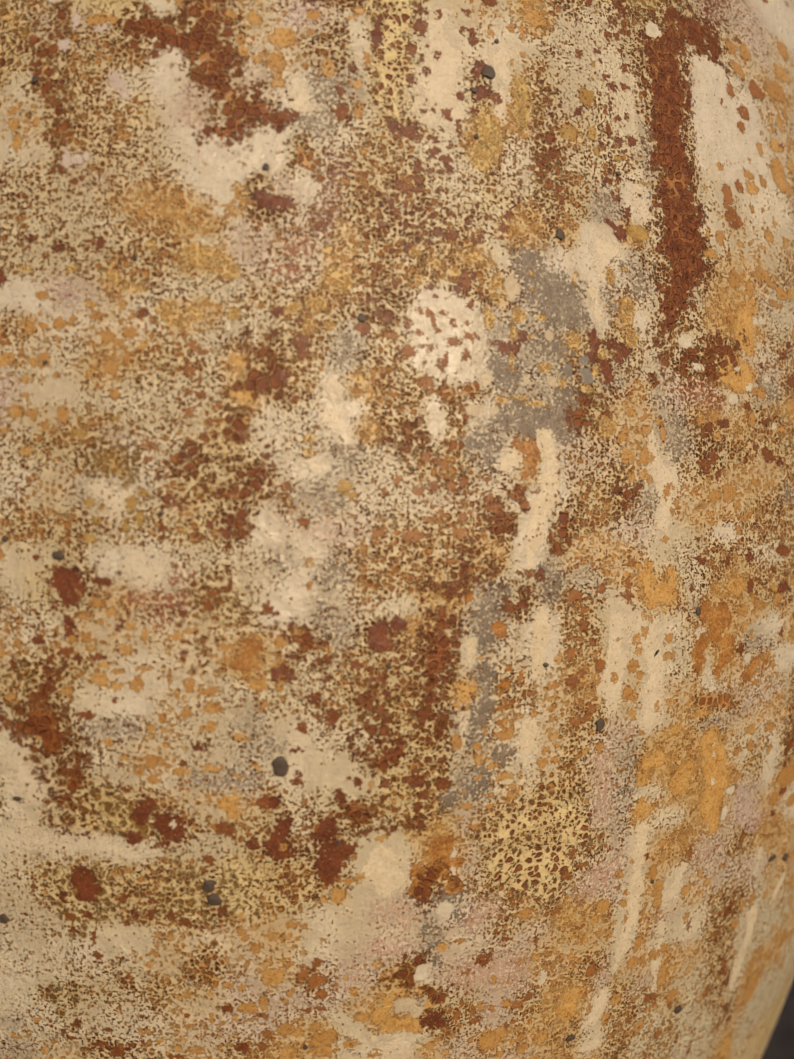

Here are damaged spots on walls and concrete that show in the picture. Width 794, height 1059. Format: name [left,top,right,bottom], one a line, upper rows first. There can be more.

peeling [150,35,188,106]
peeling [284,75,314,121]
peeling [679,48,766,187]
peeling [678,333,693,349]
peeling [727,375,770,406]
peeling [0,724,259,942]